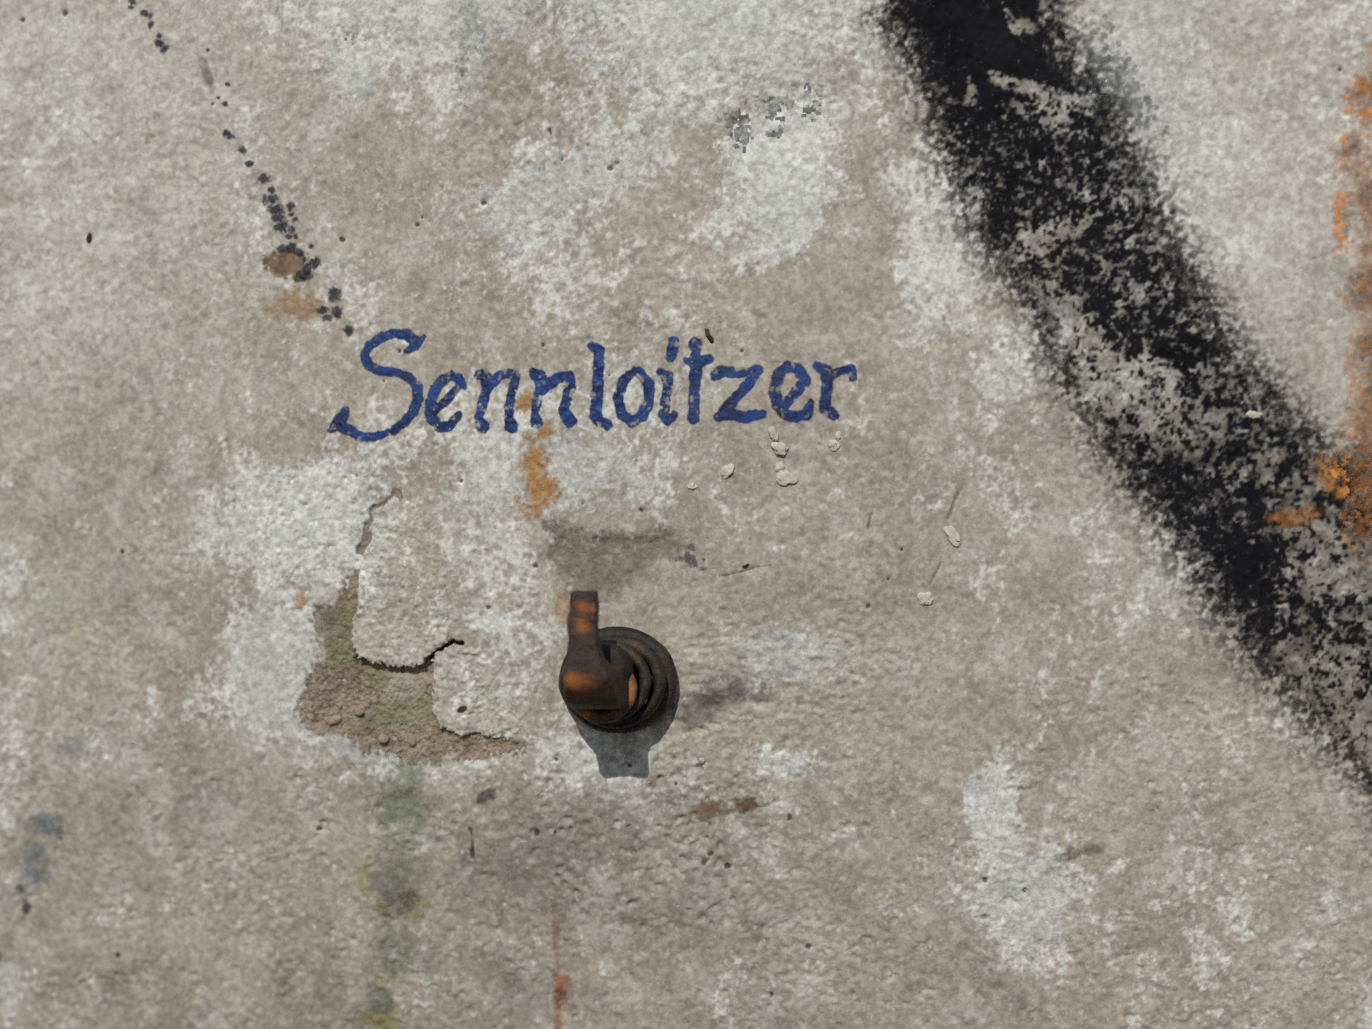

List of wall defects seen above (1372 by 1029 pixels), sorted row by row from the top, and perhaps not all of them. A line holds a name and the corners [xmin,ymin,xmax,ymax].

rust [1344,76,1372,121]
rust [1333,182,1372,245]
rust [516,392,531,412]
rust [519,426,561,517]
rust [1322,336,1372,518]
spalling [293,500,526,766]